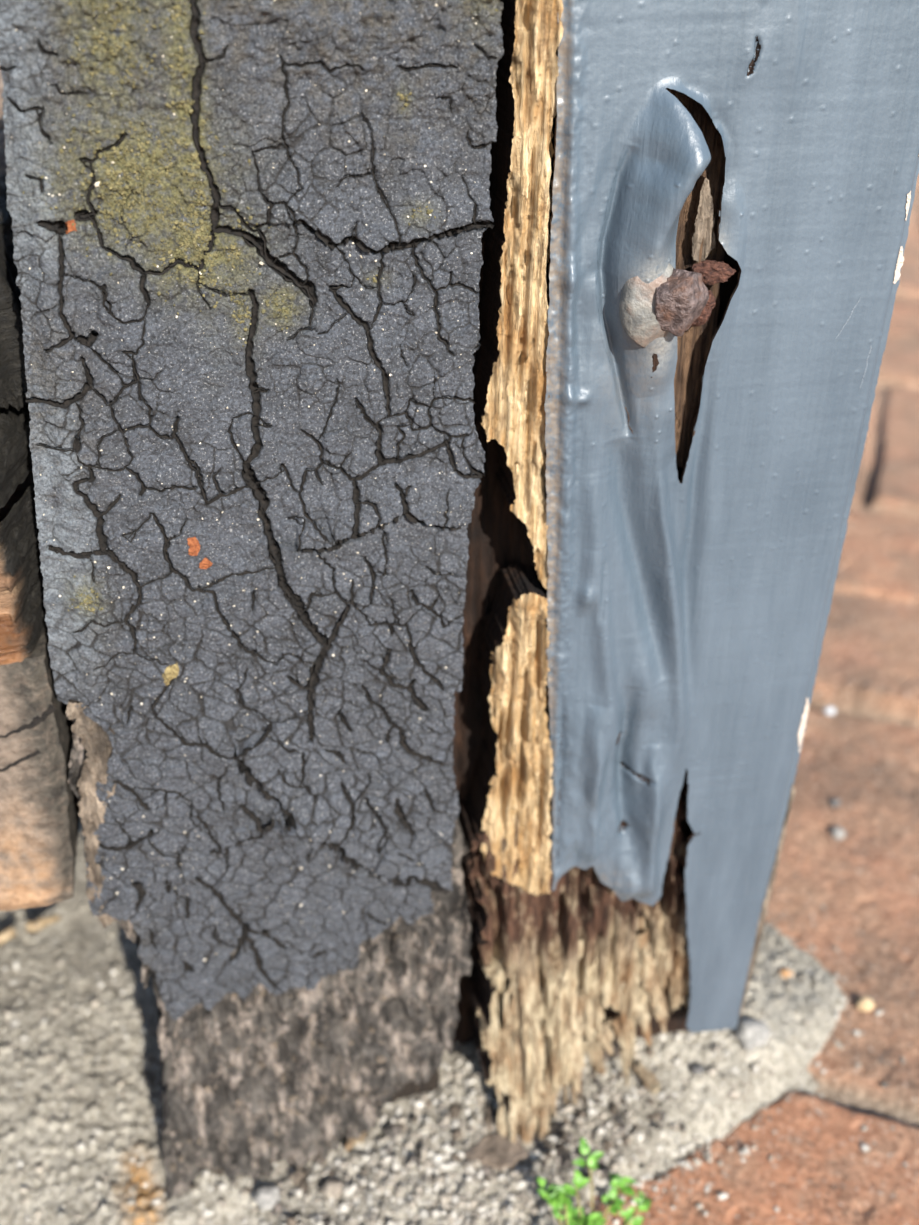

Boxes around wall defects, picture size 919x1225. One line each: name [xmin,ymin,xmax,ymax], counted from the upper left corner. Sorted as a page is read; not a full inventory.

crack [0,67,89,143]
spalling [665,88,725,271]
spalling [674,283,720,468]
rust [187,537,213,569]
crack [26,0,496,990]